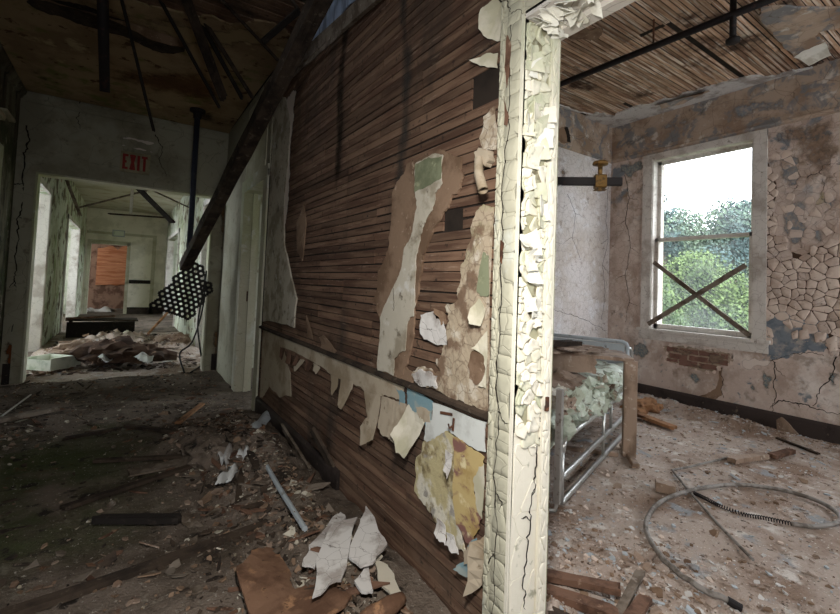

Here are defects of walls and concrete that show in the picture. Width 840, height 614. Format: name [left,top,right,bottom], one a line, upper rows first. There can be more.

crack [9,125,30,288]
spalling [260,0,840,614]
crack [554,175,637,331]
crack [770,352,840,415]